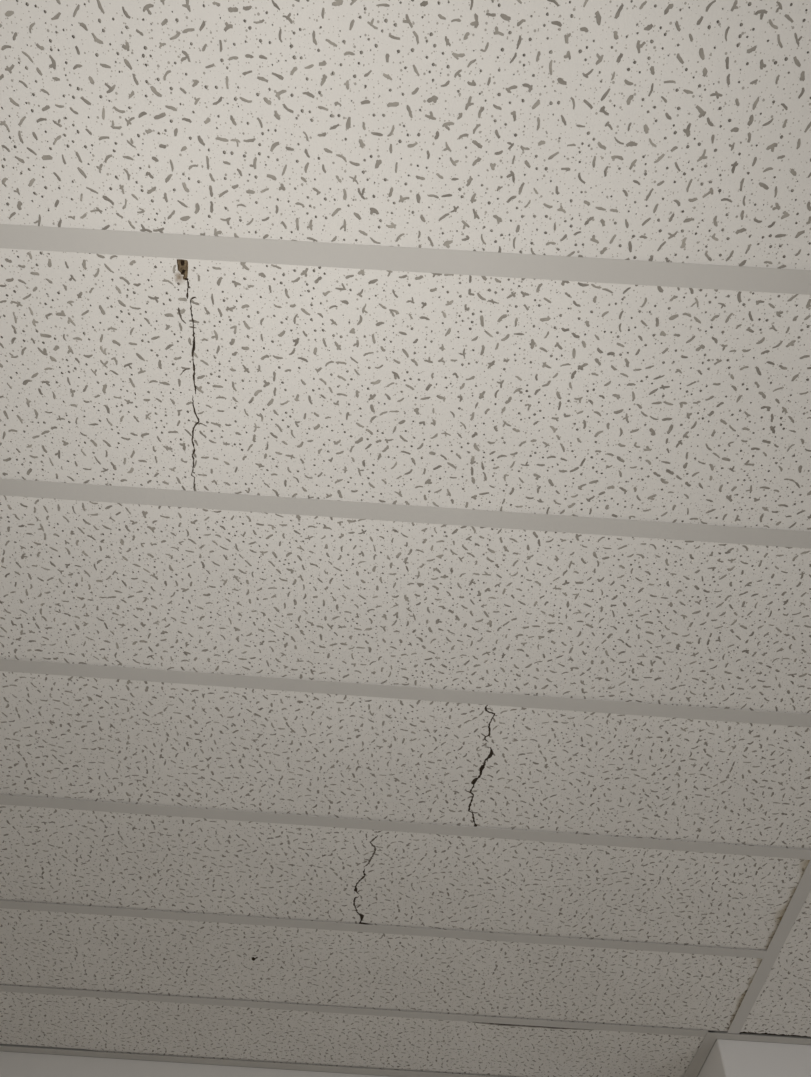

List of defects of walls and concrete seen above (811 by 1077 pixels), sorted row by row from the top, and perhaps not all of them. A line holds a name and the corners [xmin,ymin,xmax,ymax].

crack [178,280,206,486]
crack [465,705,495,827]
crack [353,831,383,925]